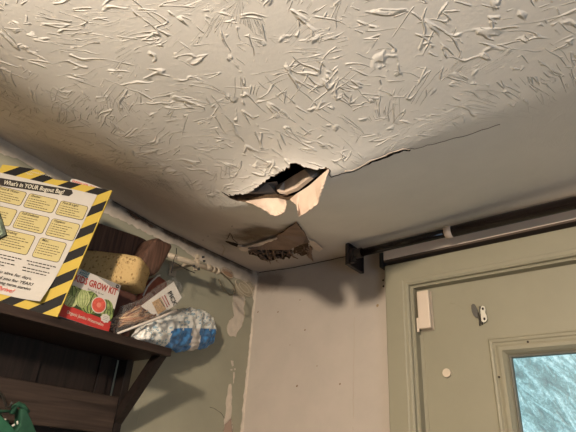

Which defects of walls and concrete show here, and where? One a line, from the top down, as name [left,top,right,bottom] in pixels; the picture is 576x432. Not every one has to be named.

crack [328,124,500,178]
spalling [222,184,295,202]
peeling [227,293,246,337]